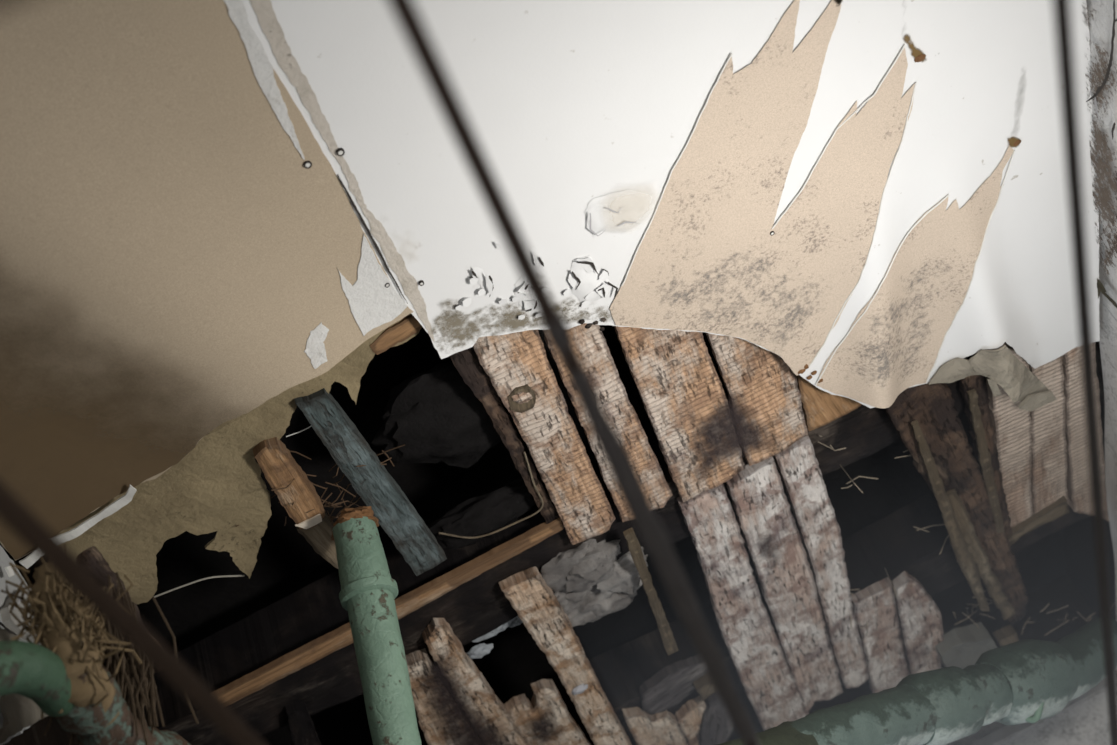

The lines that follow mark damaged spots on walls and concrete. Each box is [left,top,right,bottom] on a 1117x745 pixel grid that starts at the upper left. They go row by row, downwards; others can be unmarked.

corrosion [904,35,926,62]
damp [1086,42,1117,277]
peeling [546,0,1015,408]
peeling [532,252,545,267]
peeling [304,323,329,369]
damp [432,301,542,349]
damp [556,301,612,321]
damp [0,333,203,535]
peeling [0,588,41,645]